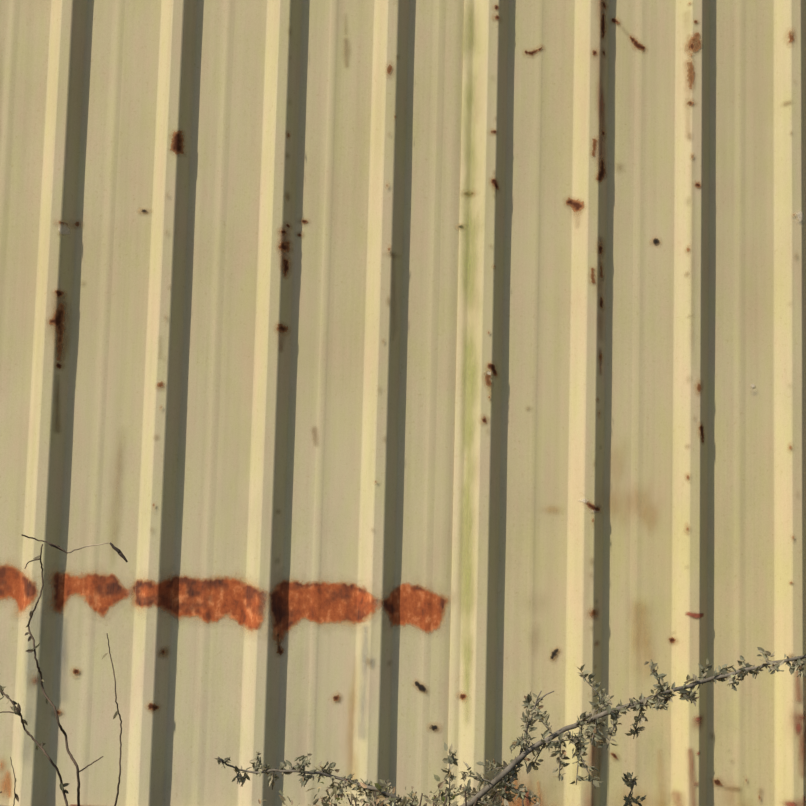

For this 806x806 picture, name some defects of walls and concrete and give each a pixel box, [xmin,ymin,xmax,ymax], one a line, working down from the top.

corrosion [687,20,701,89]
corrosion [170,130,184,155]
corrosion [592,92,606,182]
corrosion [566,197,584,212]
corrosion [278,224,290,277]
corrosion [49,290,65,369]
corrosion [485,363,497,386]
corrosion [0,564,38,614]
corrosion [49,571,449,655]